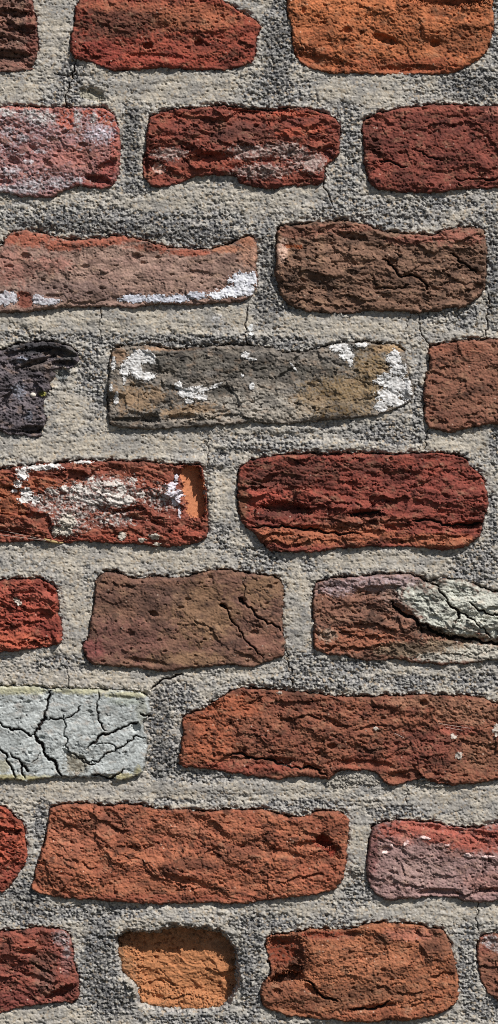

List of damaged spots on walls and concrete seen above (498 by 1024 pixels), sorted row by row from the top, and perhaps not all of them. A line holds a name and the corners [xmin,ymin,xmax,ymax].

damp [10,459,186,546]
crack [391,575,498,645]
crack [0,667,150,779]